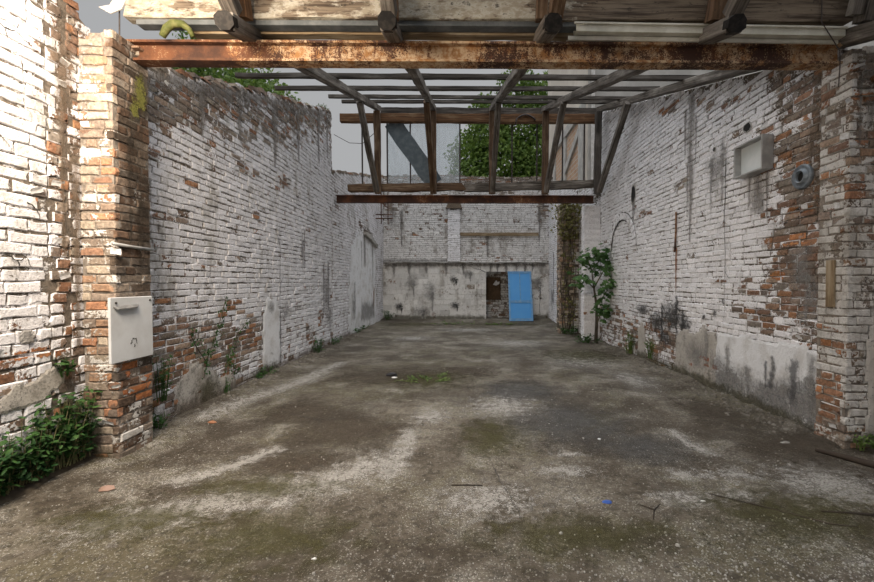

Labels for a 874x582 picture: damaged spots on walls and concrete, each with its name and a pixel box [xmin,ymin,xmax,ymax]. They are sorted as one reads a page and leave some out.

peeling [657,98,679,119]
peeling [696,85,756,113]
peeling [0,0,122,419]
peeling [715,71,874,356]
spalling [104,297,273,423]
damp [693,340,816,420]
spalling [813,360,845,429]